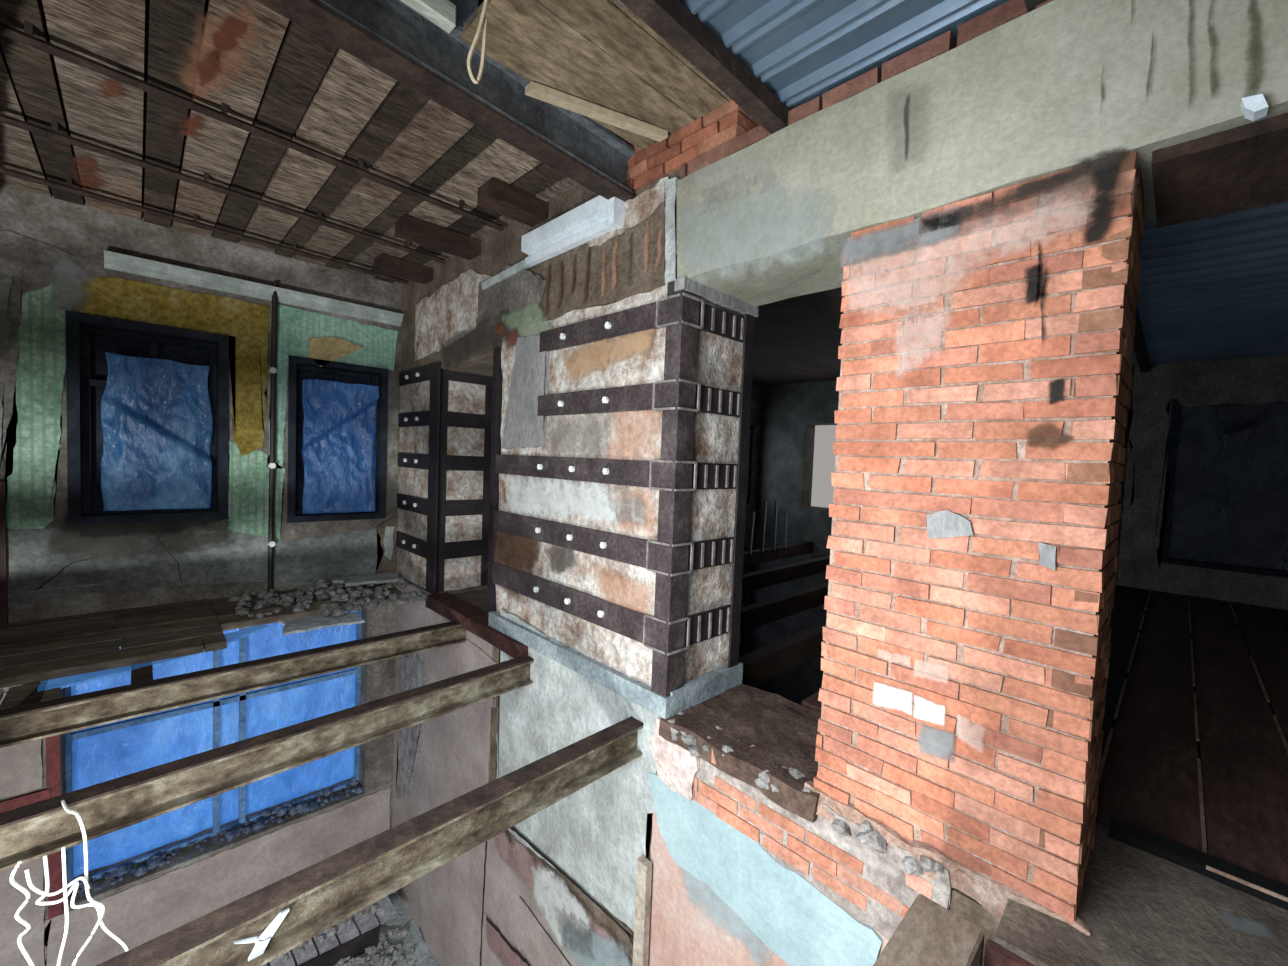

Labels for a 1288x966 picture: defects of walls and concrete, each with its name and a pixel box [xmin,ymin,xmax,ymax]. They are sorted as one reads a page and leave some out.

rust [198,18,246,86]
rust [255,0,635,202]
damp [1146,35,1154,94]
damp [1188,0,1217,100]
damp [1247,0,1260,91]
flaking render [587,177,680,294]
flaking render [414,263,551,369]
spalling [648,712,1091,966]